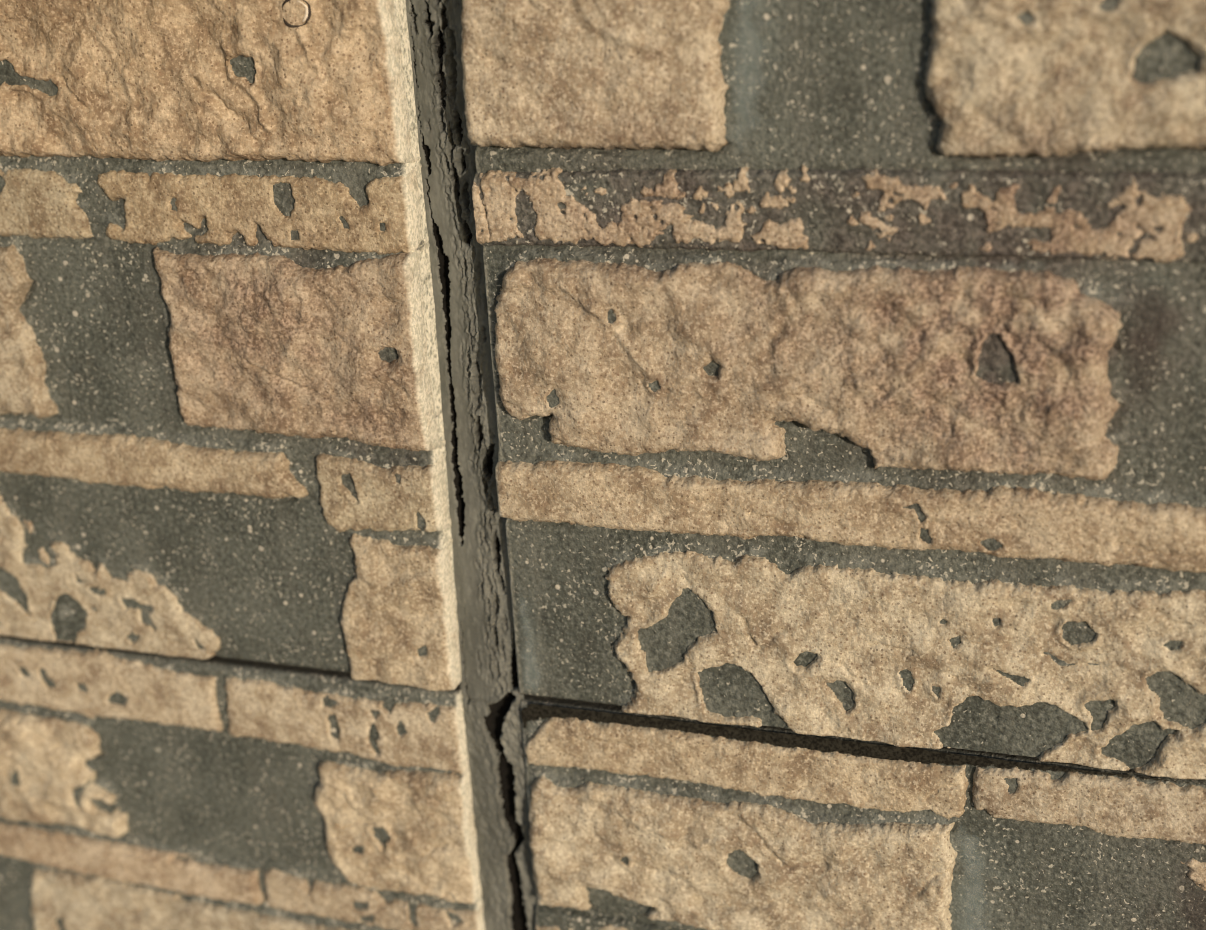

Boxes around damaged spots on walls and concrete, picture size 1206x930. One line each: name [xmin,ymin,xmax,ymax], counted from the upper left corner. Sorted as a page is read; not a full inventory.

spalling [273,182,299,240]
peeling [472,165,1206,263]
crack [409,5,494,544]
crack [494,537,502,561]
spalling [0,567,30,614]
spalling [50,593,87,642]
spalling [638,588,717,672]
spalling [1051,599,1097,646]
spalling [698,663,790,729]
spalling [826,680,855,711]
spalling [934,671,1206,769]
crack [460,621,529,930]